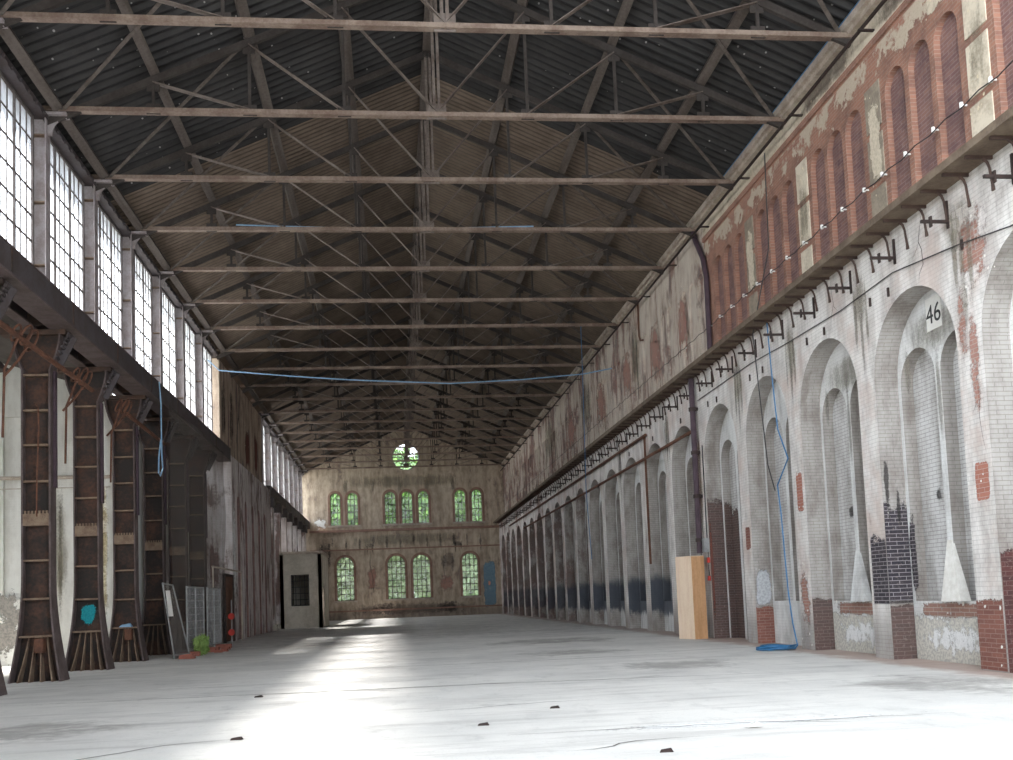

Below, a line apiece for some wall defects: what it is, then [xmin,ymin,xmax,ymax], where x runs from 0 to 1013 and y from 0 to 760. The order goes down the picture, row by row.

peeling [926,0,942,20]
peeling [865,97,883,196]
spalling [975,461,990,501]
peeling [0,593,20,666]
spalling [707,498,751,639]
spalling [755,568,776,644]
peeling [891,548,1013,673]